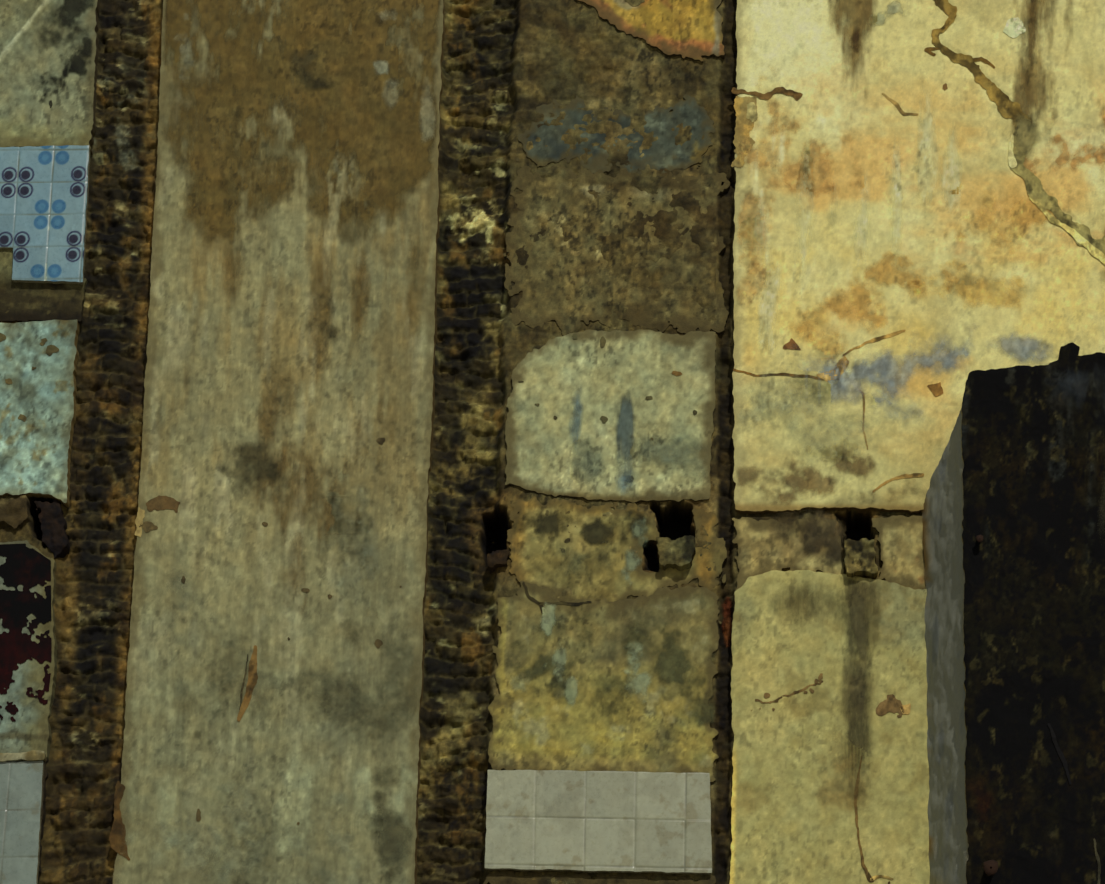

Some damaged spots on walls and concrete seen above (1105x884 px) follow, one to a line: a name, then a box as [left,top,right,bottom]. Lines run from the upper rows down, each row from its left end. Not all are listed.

leakage [165,0,440,289]
leakage [834,0,873,73]
crack [882,93,918,116]
crack [924,0,1105,265]
leakage [1014,0,1054,118]
peeling [0,544,52,722]
crack [755,673,823,711]
leakage [841,580,875,774]
crack [854,758,893,884]